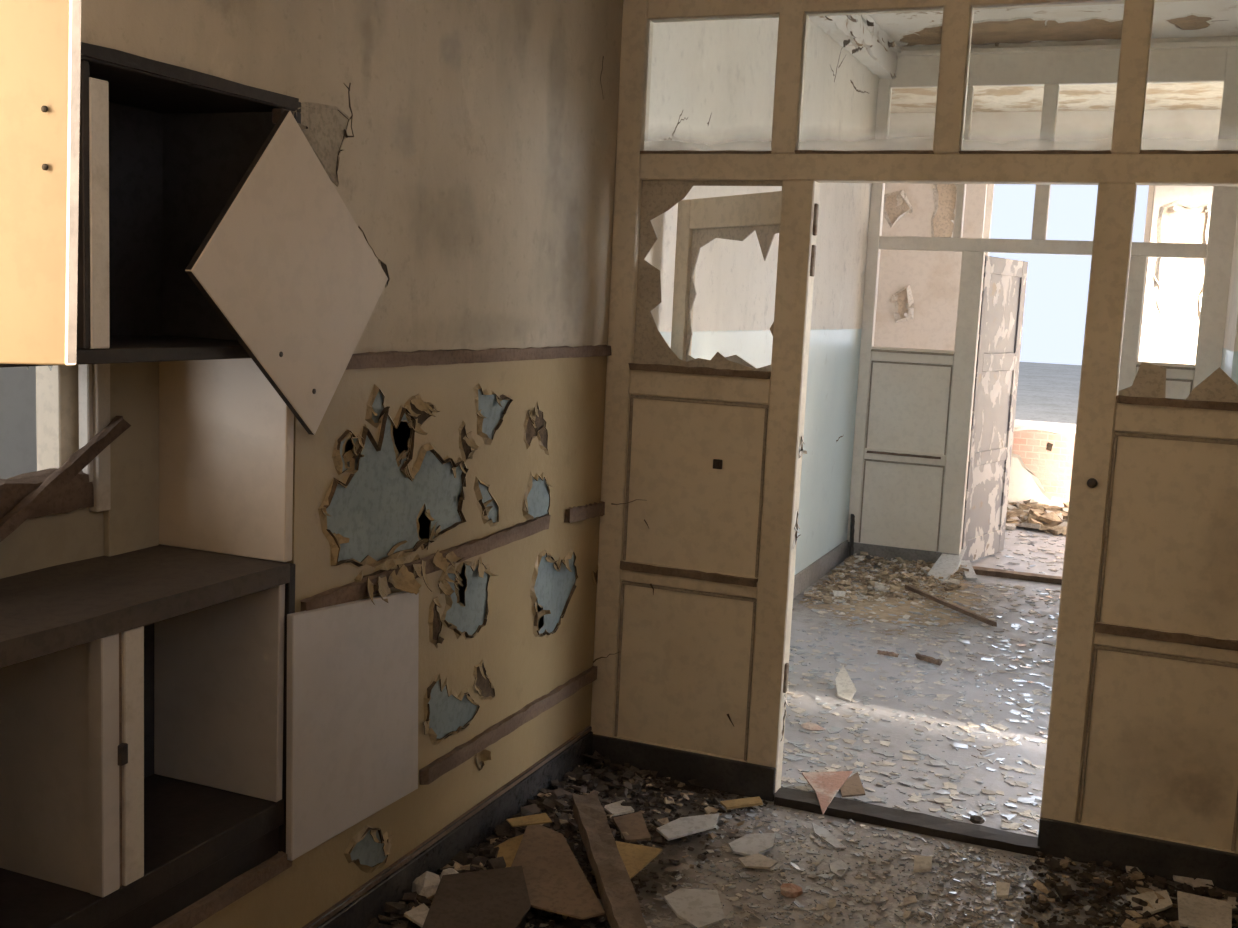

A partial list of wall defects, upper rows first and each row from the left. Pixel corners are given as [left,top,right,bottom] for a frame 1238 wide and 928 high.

peeling [825,14,942,60]
peeling [971,17,1123,47]
peeling [1163,13,1215,30]
flaking render [293,102,350,187]
crack [337,83,354,171]
peeling [883,190,913,228]
peeling [318,383,513,648]
peeling [523,401,549,455]
peeling [522,472,553,520]
flaking render [1011,424,1076,505]
peeling [530,548,598,638]
peeling [423,659,495,745]